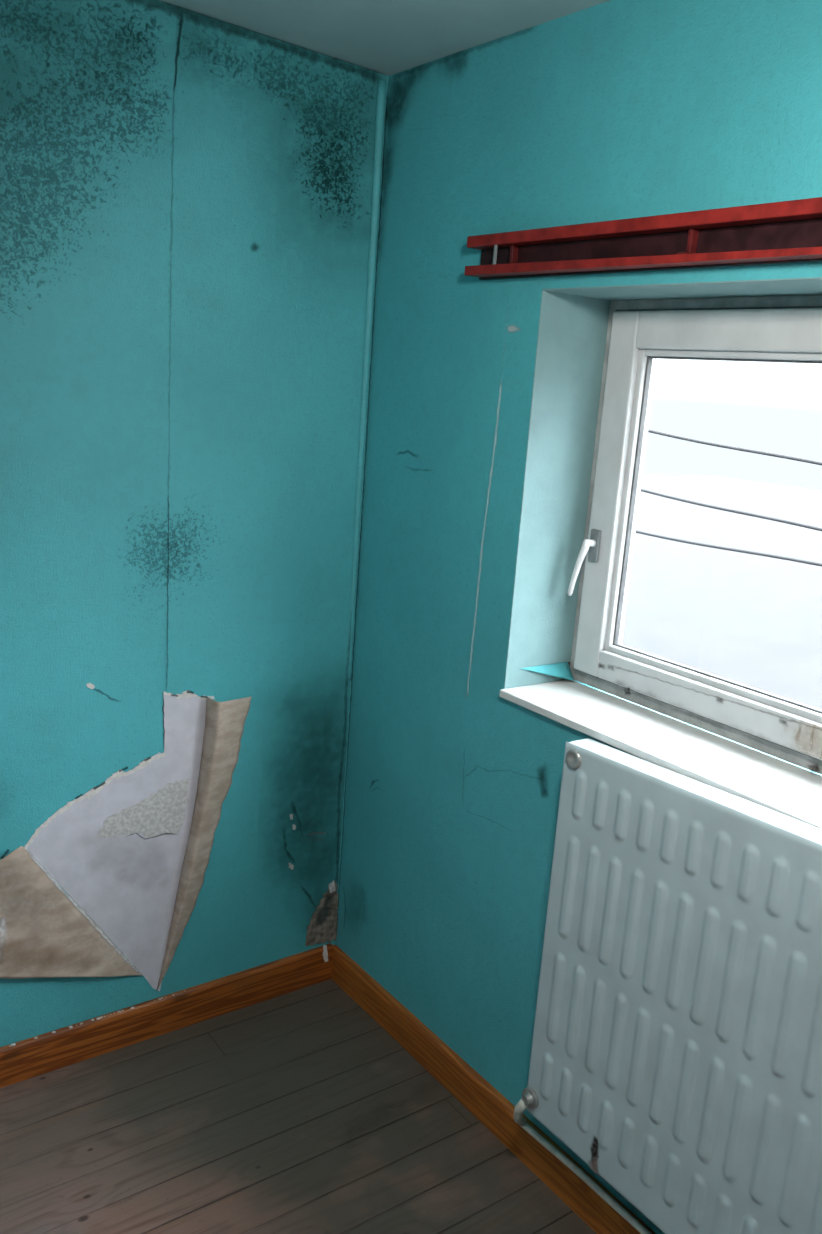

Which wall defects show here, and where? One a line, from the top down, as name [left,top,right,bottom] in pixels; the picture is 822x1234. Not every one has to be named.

crack [174,20,182,87]
peeling [112,758,151,780]
spalling [305,880,339,962]